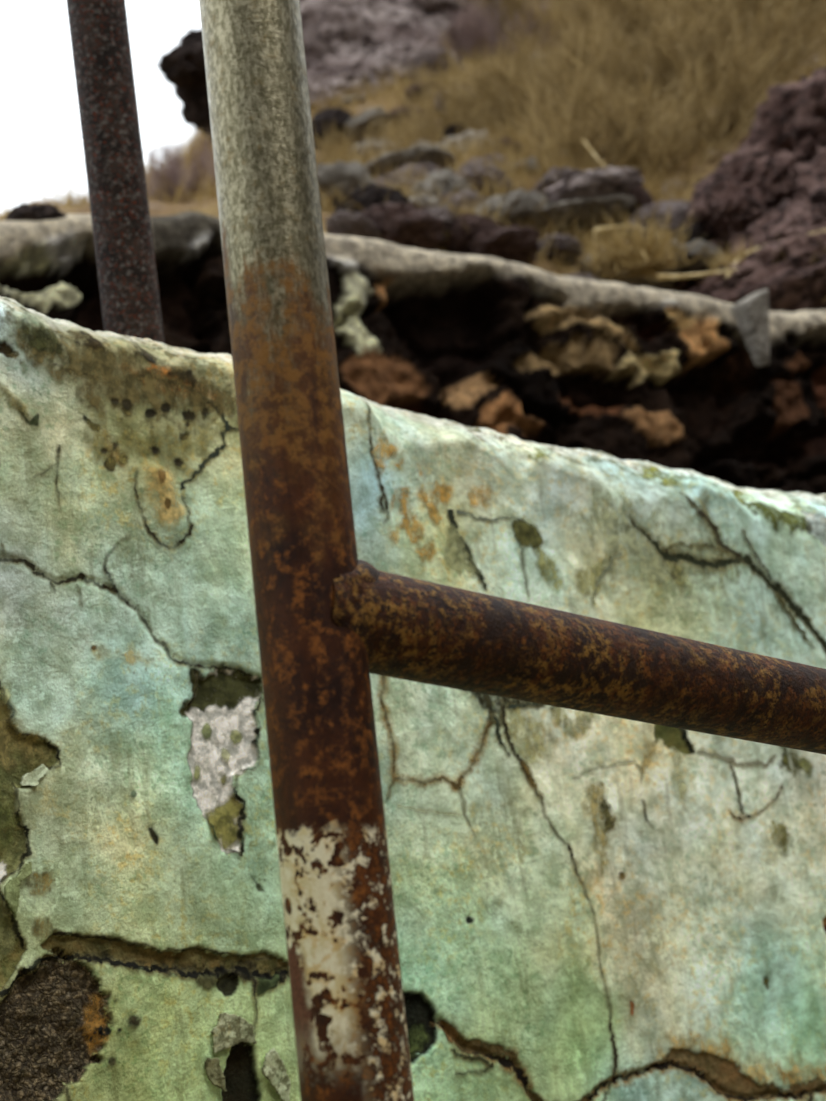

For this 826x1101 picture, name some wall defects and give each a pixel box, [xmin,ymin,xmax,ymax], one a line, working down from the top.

crack [37,444,61,496]
crack [0,542,253,679]
crack [98,374,239,490]
corrosion [390,481,452,559]
crack [445,509,543,594]
crack [592,553,623,603]
crack [630,492,826,652]
peeling [179,664,264,857]
spalling [0,681,141,1101]
crack [379,676,826,1101]
spalling [204,977,291,1101]
spalling [403,992,437,1063]